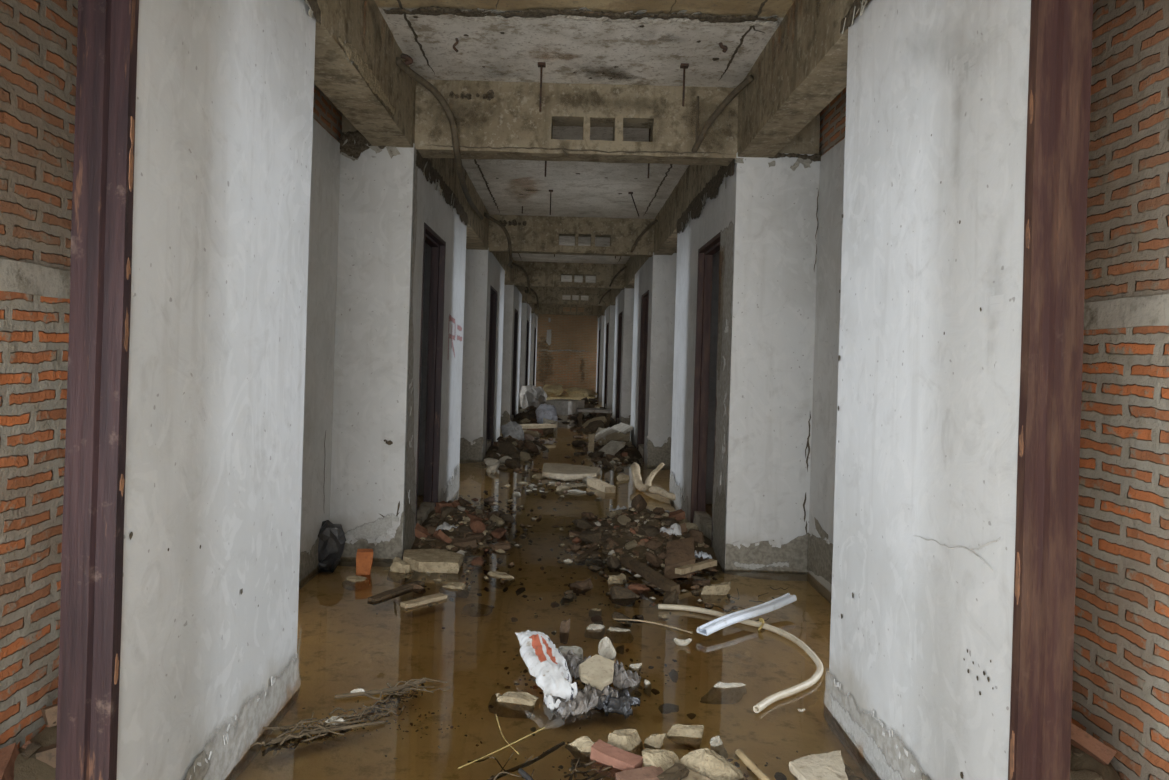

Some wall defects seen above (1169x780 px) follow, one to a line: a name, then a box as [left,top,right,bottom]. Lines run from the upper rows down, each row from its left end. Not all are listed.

spalling [304,0,321,24]
crack [397,0,435,75]
crack [718,0,768,81]
spalling [840,0,871,34]
spalling [338,130,401,161]
peeling [341,148,468,564]
peeling [712,222,833,584]
crack [803,414,811,534]
peeling [184,652,300,780]
peeling [824,671,922,780]